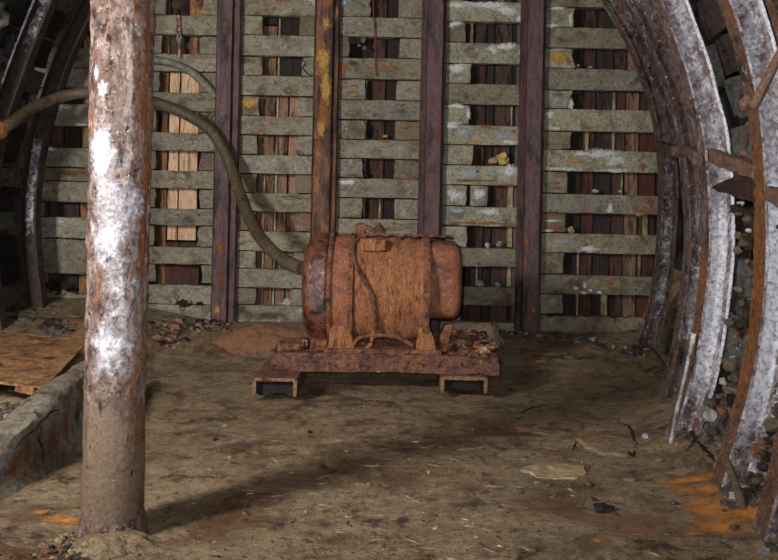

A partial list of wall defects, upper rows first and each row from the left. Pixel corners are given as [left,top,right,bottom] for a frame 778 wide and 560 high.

damp [663,0,721,148]
damp [733,0,778,187]
damp [26,139,56,235]
damp [652,217,673,319]
damp [681,244,701,338]
damp [689,180,728,403]
corrosion [738,216,765,385]
damp [739,202,778,442]
crack [14,409,59,461]